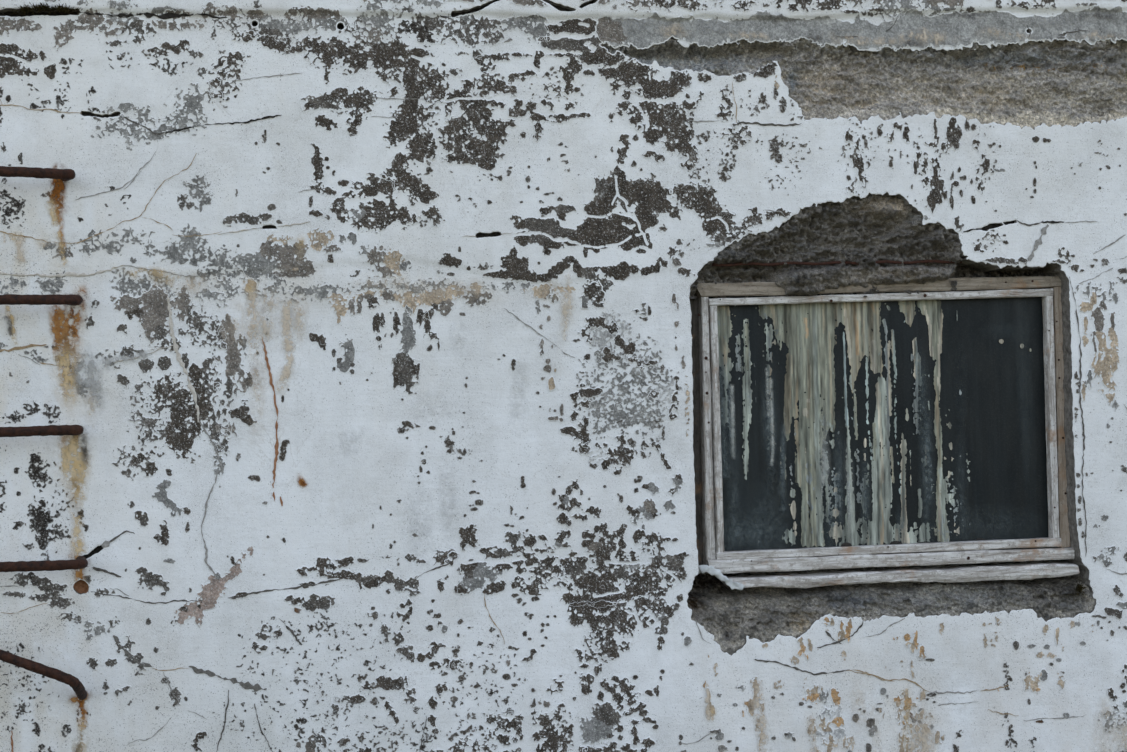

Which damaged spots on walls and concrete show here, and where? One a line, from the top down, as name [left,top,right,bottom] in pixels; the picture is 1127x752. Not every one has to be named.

crack [440,0,500,18]
crack [543,0,597,11]
crack [221,73,300,86]
crack [370,96,409,118]
crack [0,100,310,244]
rust [50,166,65,265]
rust [51,289,85,396]
crack [0,265,341,604]
rust [61,435,87,502]
crack [280,619,302,645]
crack [755,618,1085,721]
leakage [754,682,768,745]